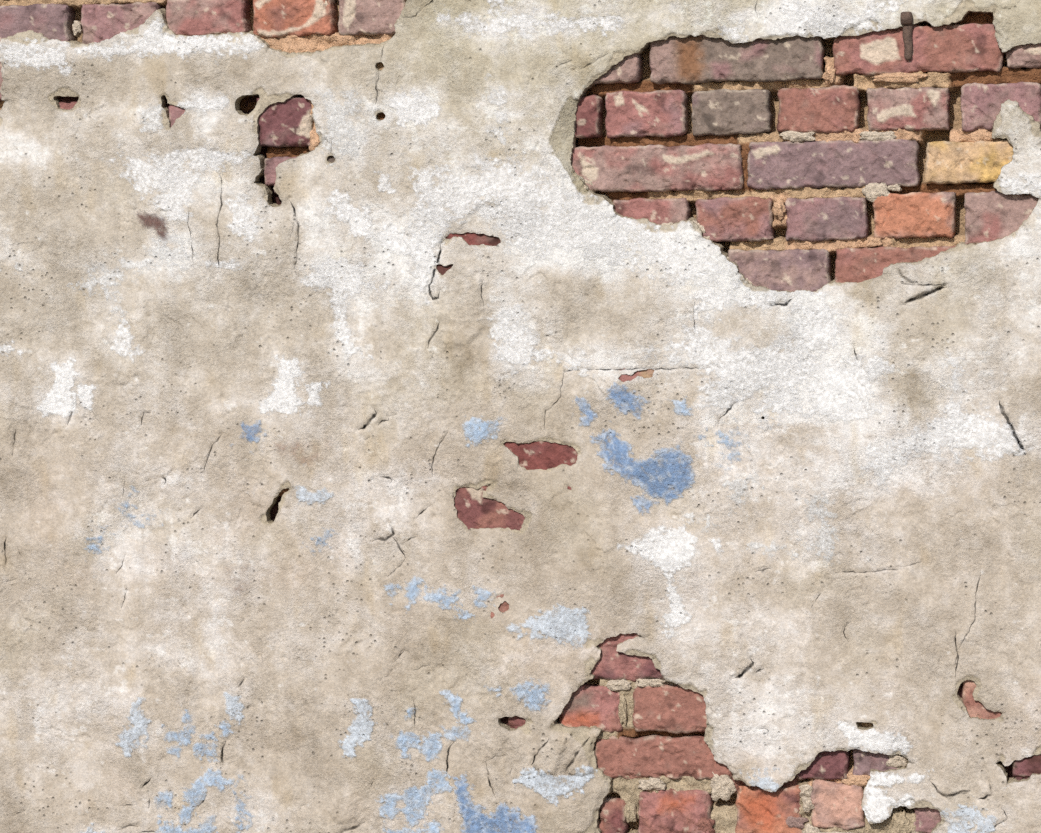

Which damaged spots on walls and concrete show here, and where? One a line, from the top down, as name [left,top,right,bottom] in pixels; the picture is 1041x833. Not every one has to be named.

spalling [0,0,407,54]
spalling [53,96,79,110]
spalling [197,94,320,207]
spalling [550,11,1041,293]
spalling [446,232,501,246]
crack [999,402,1026,455]
spalling [503,441,578,470]
spalling [266,488,289,524]
spalling [454,484,525,530]
spalling [957,680,1002,720]
spalling [554,633,941,833]
spalling [996,754,1041,783]